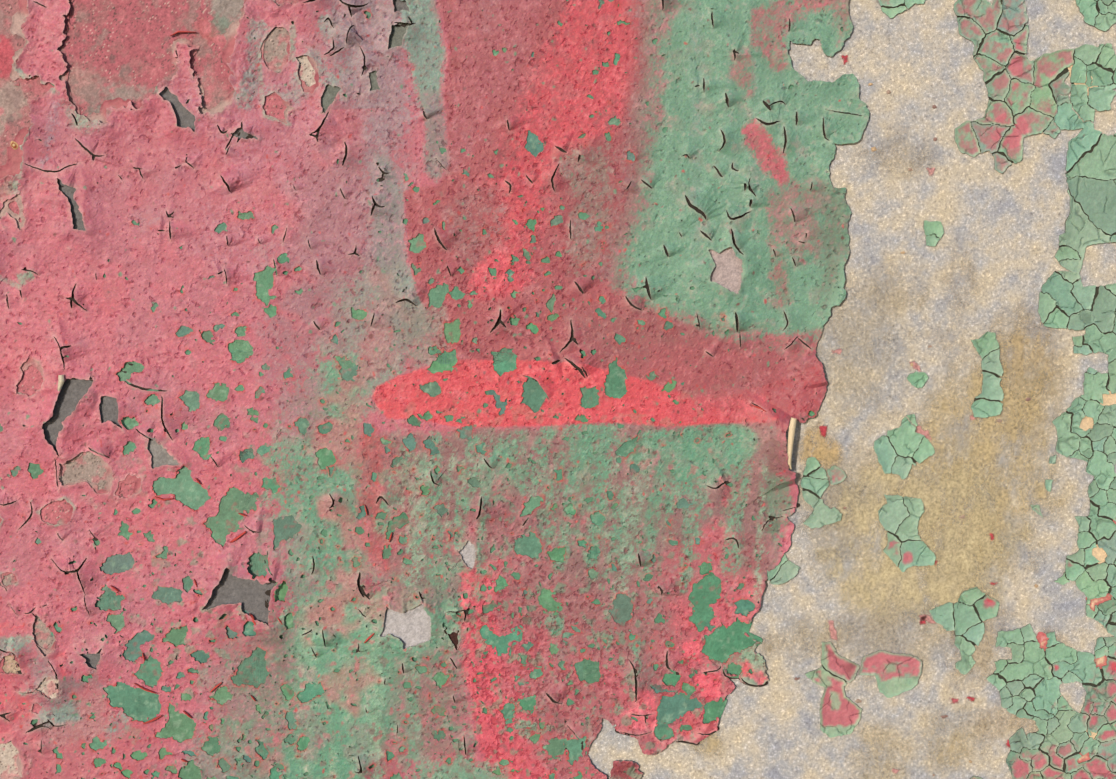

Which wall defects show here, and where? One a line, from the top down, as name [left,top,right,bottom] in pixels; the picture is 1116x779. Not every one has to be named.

crack [1075,0,1116,31]
peeling [0,0,326,238]
peeling [253,253,302,318]
peeling [10,353,49,402]
peeling [116,361,144,384]
peeling [144,389,163,406]
peeling [178,382,231,460]
peeling [247,363,270,428]
flaking render [480,0,1116,779]
crack [986,95,1116,779]
peeling [0,416,327,779]